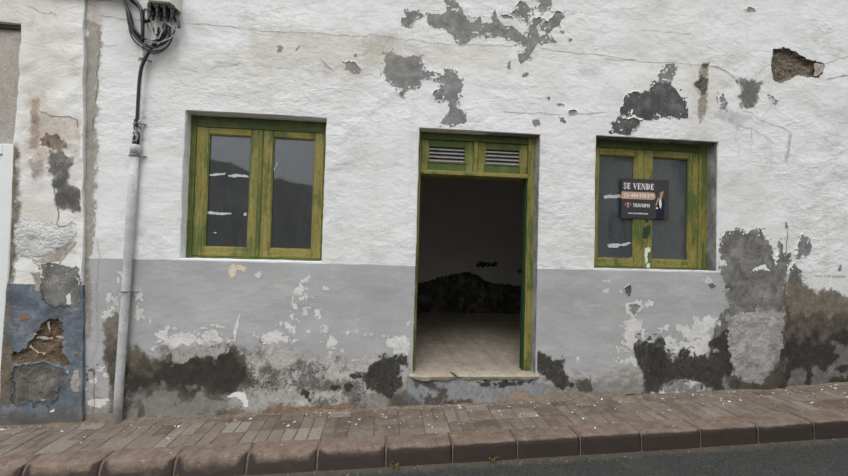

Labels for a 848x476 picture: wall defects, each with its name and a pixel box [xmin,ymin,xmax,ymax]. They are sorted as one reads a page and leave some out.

peeling [380,49,467,128]
peeling [401,0,572,77]
peeling [609,63,690,136]
flaking render [771,47,825,83]
flaking render [40,133,67,150]
peeling [0,146,110,412]
peeling [134,289,233,351]
damp [102,312,592,418]
damp [626,329,734,396]
peeling [650,373,744,406]
peeling [603,227,848,368]
damp [773,277,848,389]